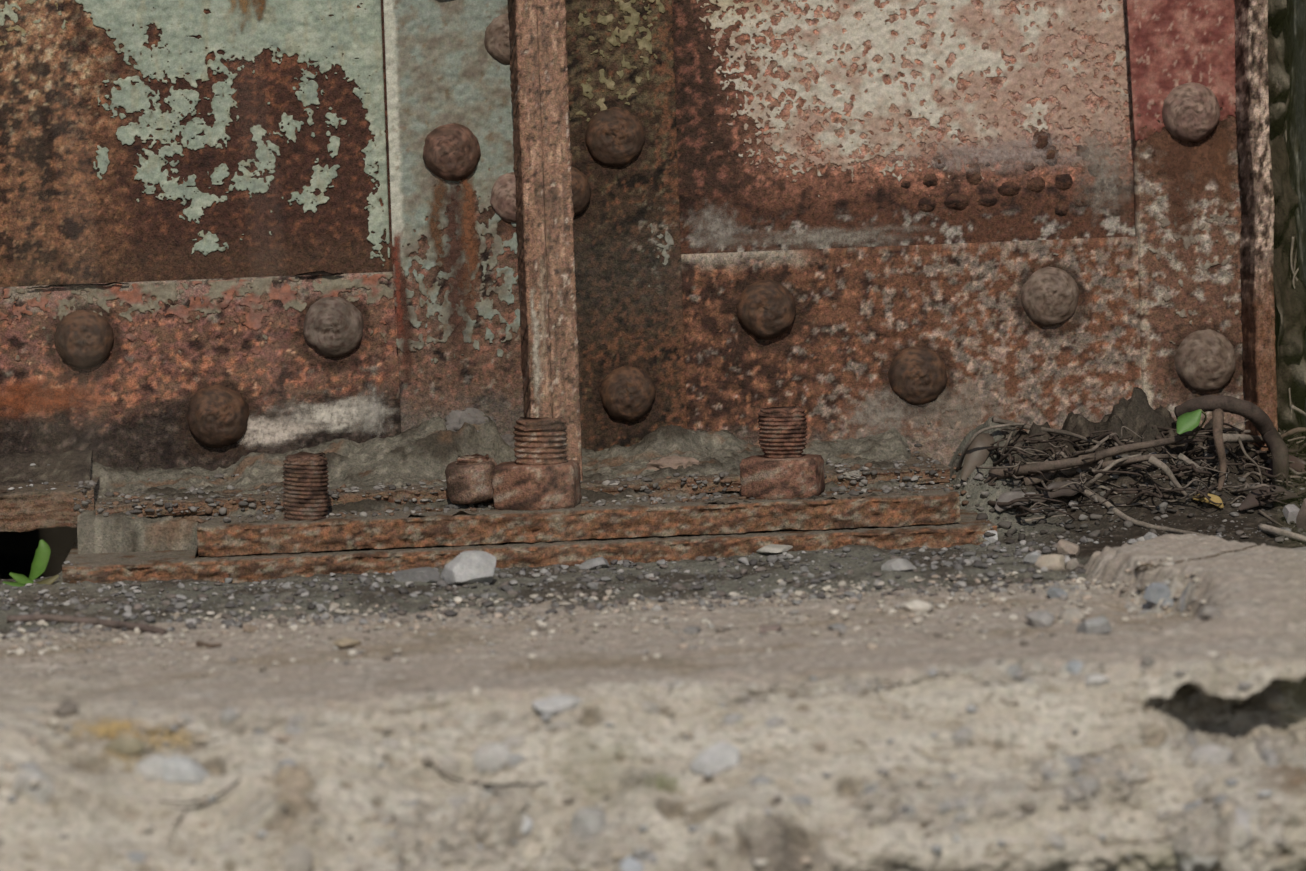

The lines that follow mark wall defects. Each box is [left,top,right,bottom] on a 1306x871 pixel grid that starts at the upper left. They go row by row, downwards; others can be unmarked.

corrosion [231,0,265,26]
peeling [0,0,521,364]
corrosion [901,130,1092,216]
corrosion [1076,145,1124,216]
corrosion [392,236,412,378]
corrosion [429,178,478,338]
corrosion [531,267,546,393]